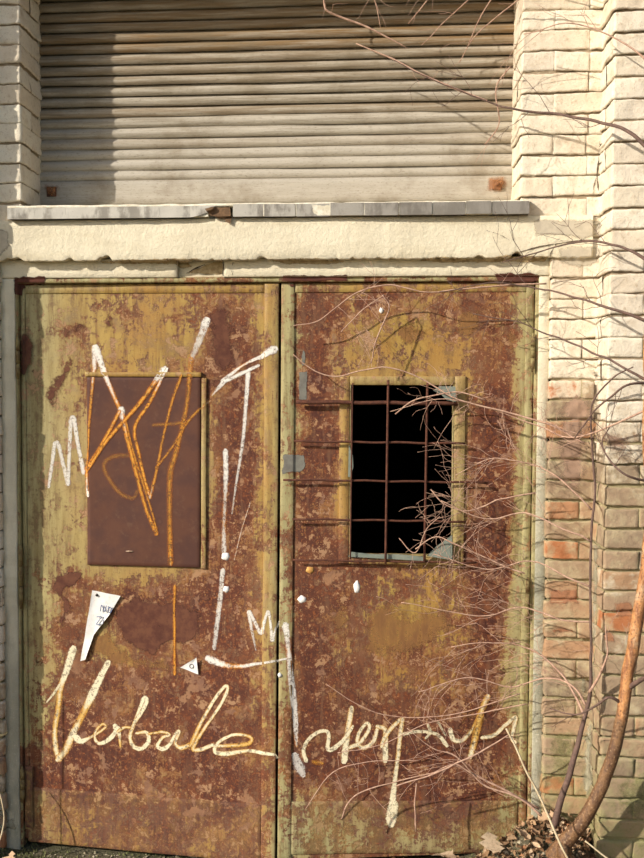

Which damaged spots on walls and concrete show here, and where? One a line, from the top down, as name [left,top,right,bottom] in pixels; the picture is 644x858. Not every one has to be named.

corrosion [14,276,45,296]
corrosion [283,275,347,287]